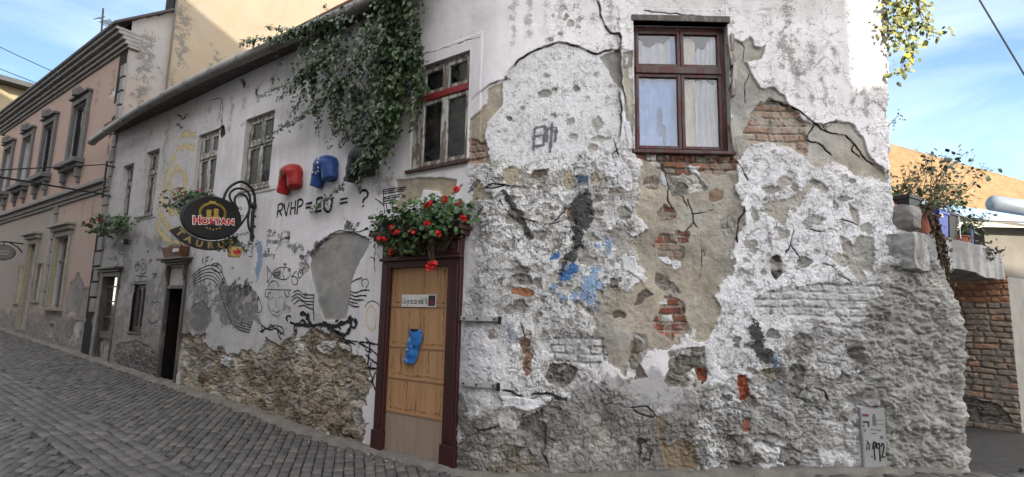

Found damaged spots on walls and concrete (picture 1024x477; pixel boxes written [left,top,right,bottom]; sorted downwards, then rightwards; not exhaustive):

crack [491,4,625,159]
crack [644,10,873,165]
flaking render [468,37,890,433]
crack [658,161,705,279]
flaking render [113,336,158,375]
flaking render [180,232,373,442]
peeling [470,409,637,473]